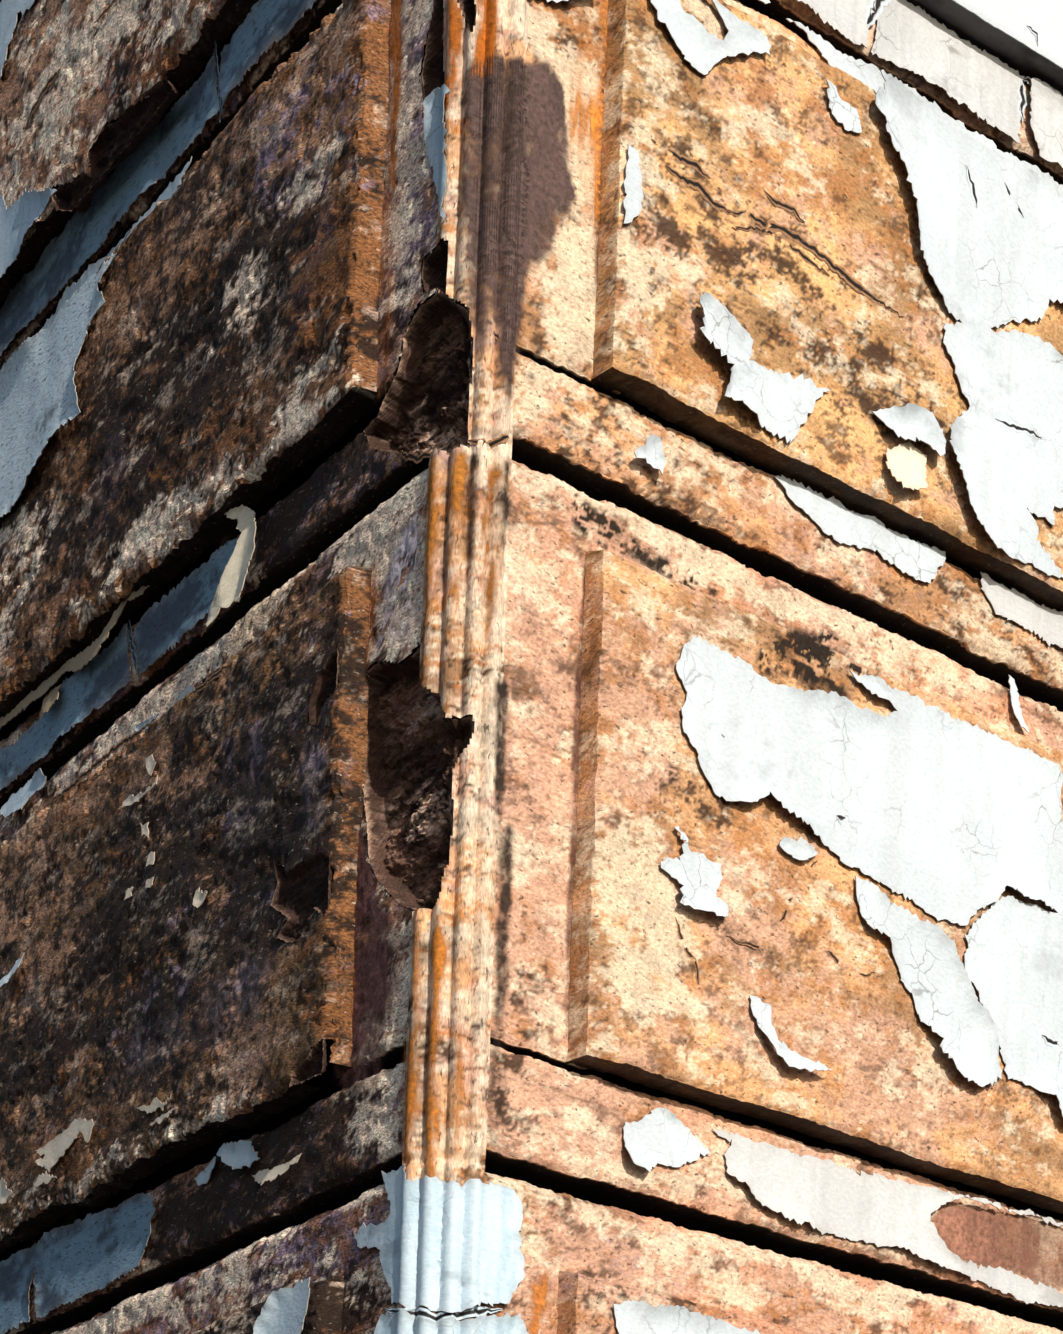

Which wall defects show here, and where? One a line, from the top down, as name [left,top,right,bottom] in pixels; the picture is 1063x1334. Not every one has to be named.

corrosion [444,0,497,108]
peeling [0,0,317,518]
damp [463,55,575,389]
peeling [699,292,831,444]
crack [651,138,904,318]
peeling [775,0,1063,584]
corrosion [426,452,500,632]
spalling [362,647,474,910]
peeling [676,635,1063,1117]
corrosion [404,924,447,1178]
crack [385,1306,503,1322]
peeling [623,1107,1063,1308]